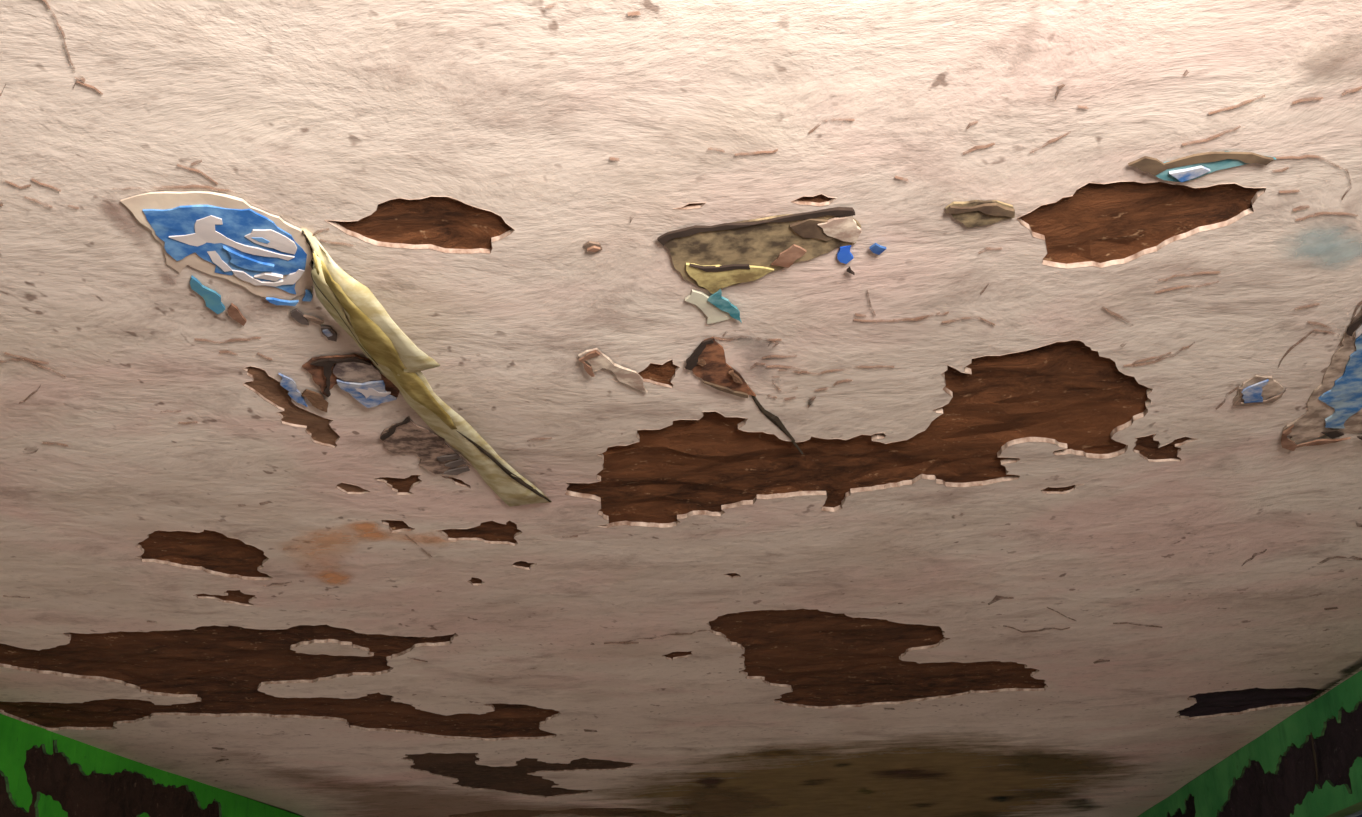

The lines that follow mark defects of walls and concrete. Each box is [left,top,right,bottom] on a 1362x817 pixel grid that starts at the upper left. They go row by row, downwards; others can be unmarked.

flaking render [325,196,515,254]
peeling [657,194,861,294]
flaking render [1017,165,1266,269]
peeling [227,303,247,326]
flaking render [242,228,1198,570]
flaking render [135,529,273,606]
flaking render [0,624,682,817]
damp [325,740,1130,817]
flaking render [707,608,1048,709]
flaking render [1175,687,1331,720]
flaking render [1216,701,1362,817]